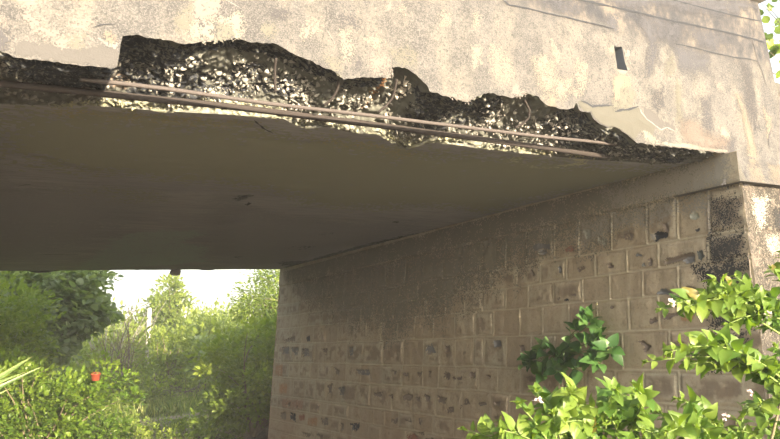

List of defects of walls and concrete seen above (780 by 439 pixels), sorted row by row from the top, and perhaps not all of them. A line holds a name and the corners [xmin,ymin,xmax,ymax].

spalling [0,34,728,167]
damp [0,0,780,349]